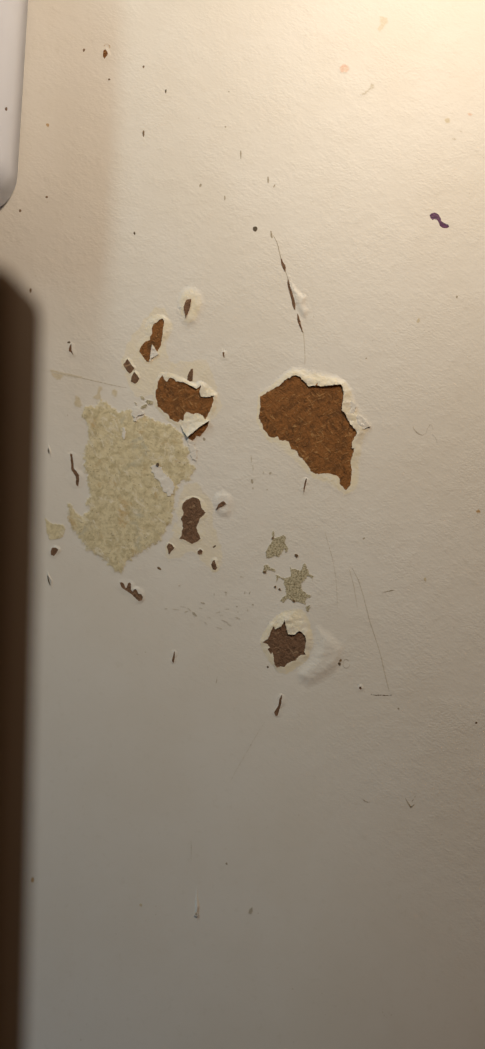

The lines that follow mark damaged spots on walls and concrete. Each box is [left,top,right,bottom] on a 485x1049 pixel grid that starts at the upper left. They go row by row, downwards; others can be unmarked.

crack [270,231,305,352]
peeling [44,314,220,604]
peeling [254,366,372,496]
peeling [260,530,314,675]